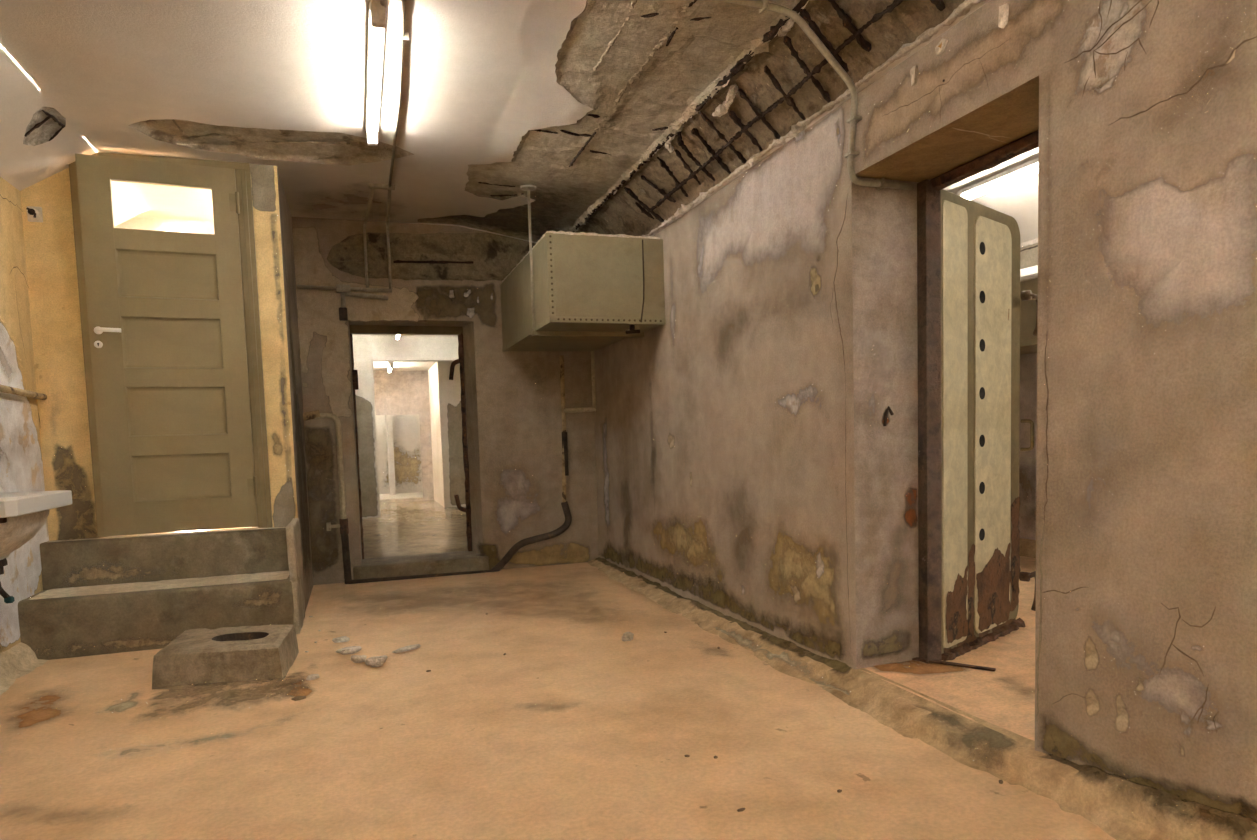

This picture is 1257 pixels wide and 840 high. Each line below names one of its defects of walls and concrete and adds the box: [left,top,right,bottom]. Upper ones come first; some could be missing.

spalling [567,0,986,237]
crack [1065,0,1159,97]
flaking render [1080,0,1145,92]
crack [1110,36,1257,125]
peeling [0,316,45,493]
leakage [498,473,533,532]
corrosion [904,488,917,527]
peeling [0,520,49,647]
leakage [479,498,851,674]
leakage [862,631,909,658]
corrosion [875,497,1026,674]
crack [1159,603,1219,733]